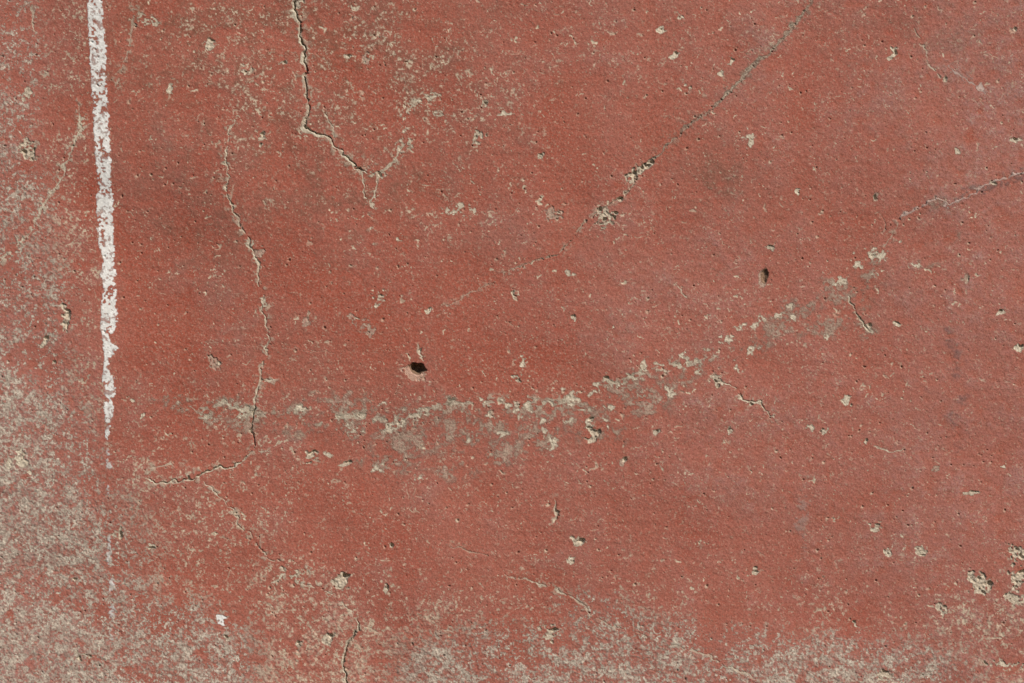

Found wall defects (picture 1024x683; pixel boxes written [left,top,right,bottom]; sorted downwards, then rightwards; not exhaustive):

crack [290,0,444,245]
crack [577,0,813,231]
crack [148,120,275,527]
peeling [199,247,887,480]
crack [263,552,360,683]